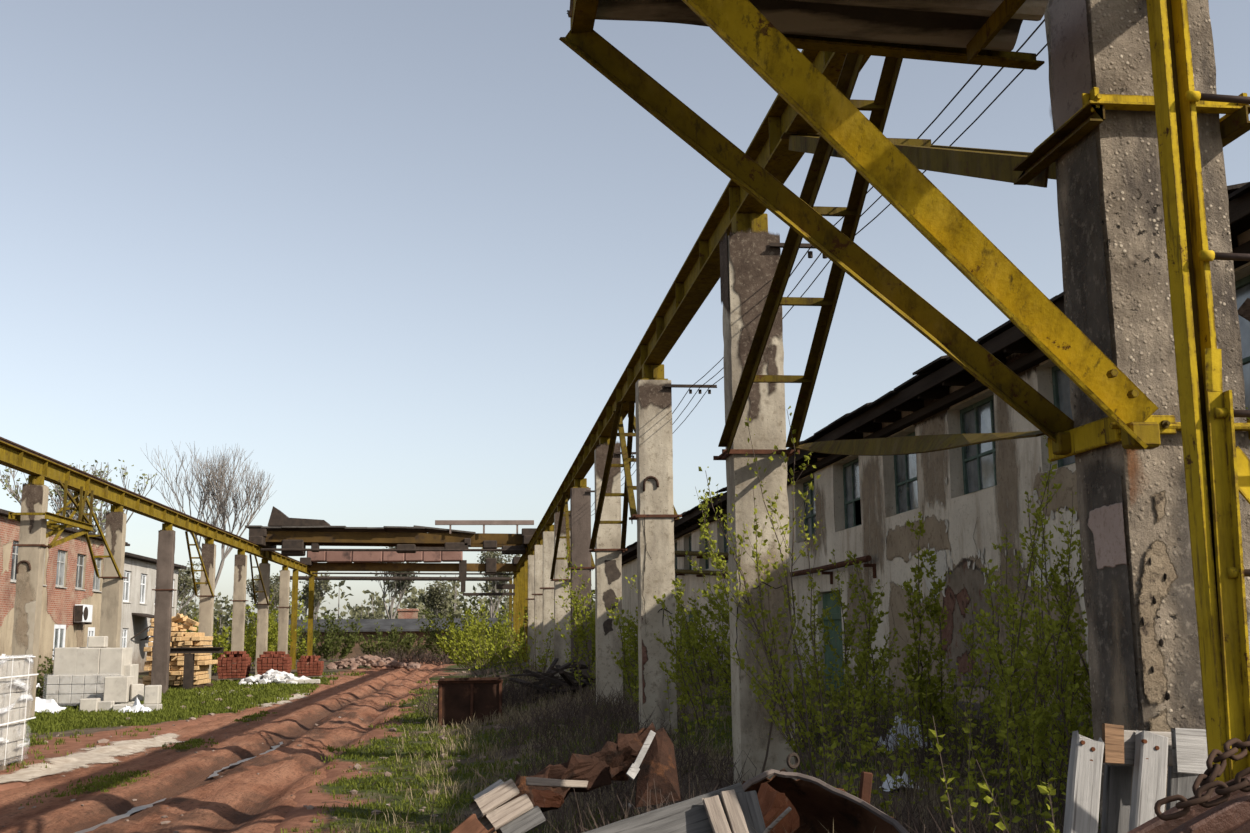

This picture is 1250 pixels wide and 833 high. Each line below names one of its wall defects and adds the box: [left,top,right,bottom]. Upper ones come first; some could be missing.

damp [719,231,783,421]
peeling [920,416,947,435]
damp [21,483,43,533]
damp [15,563,36,701]
spalling [885,450,1090,718]